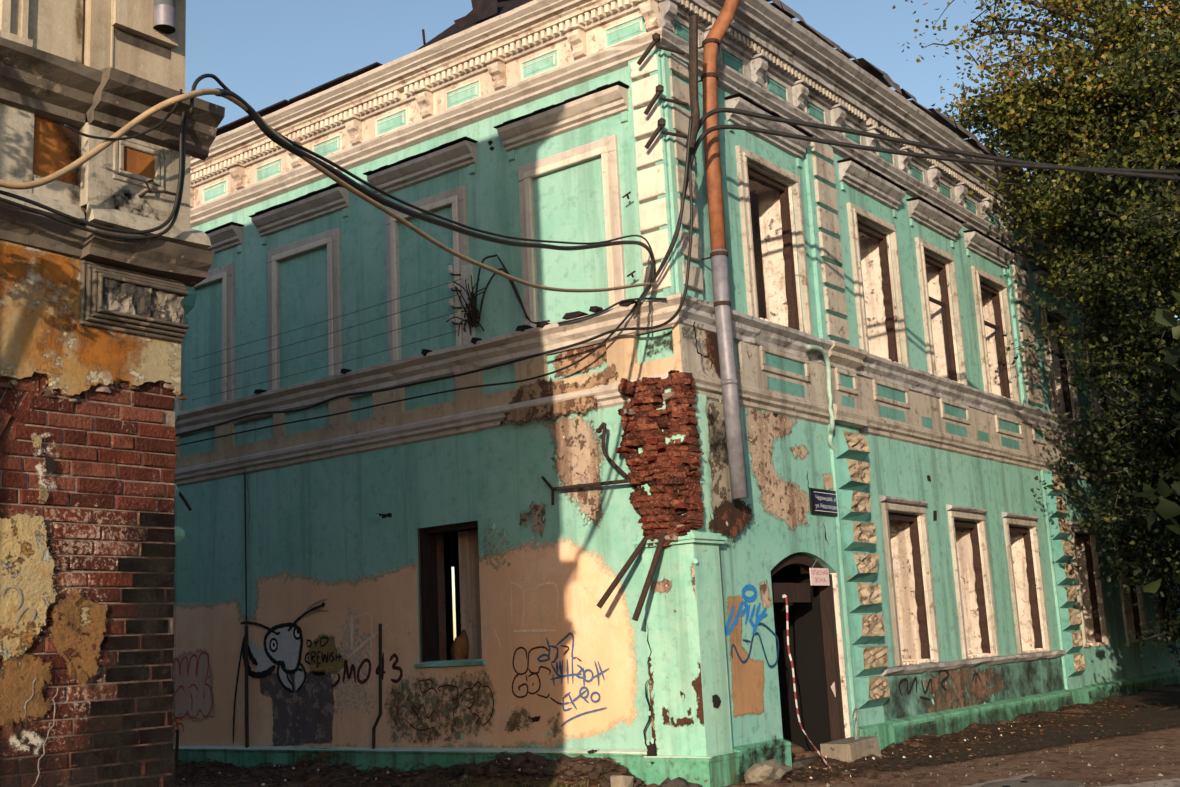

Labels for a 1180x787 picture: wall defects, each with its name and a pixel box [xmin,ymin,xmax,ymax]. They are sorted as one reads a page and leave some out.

peeling [95,381,141,393]
spalling [499,342,810,548]
peeling [644,657,704,764]